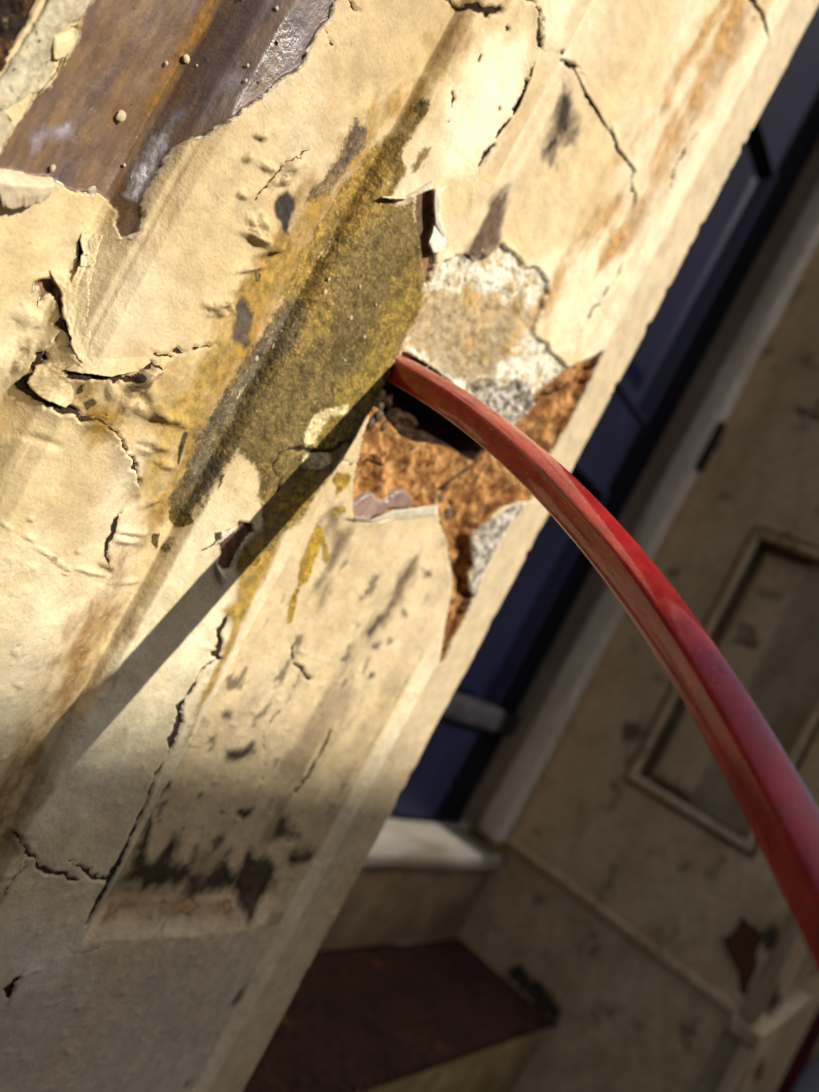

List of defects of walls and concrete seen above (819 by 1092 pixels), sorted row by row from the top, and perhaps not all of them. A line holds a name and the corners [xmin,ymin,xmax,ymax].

crack [447,0,509,31]
crack [748,0,768,36]
peeling [0,0,337,240]
crack [474,0,636,206]
damp [386,148,431,196]
crack [670,135,696,187]
damp [141,107,375,553]
damp [81,386,114,438]
spalling [352,181,603,666]
peeling [207,521,254,585]
crack [0,614,229,954]
peeling [722,915,763,996]